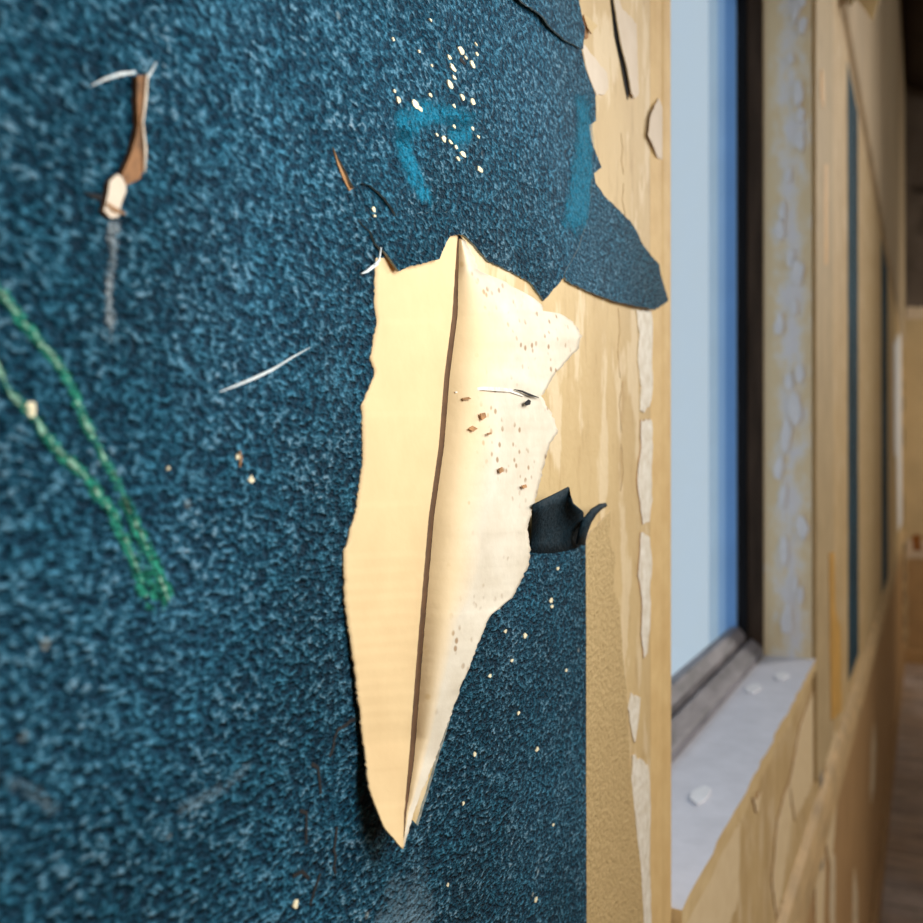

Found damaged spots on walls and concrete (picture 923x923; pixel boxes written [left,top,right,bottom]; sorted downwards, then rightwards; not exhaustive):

peeling [393,89,423,112]
peeling [435,124,466,161]
peeling [447,42,479,108]
peeling [519,0,608,95]
peeling [610,0,639,100]
peeling [648,98,662,160]
peeling [563,178,668,658]
peeling [332,145,607,849]